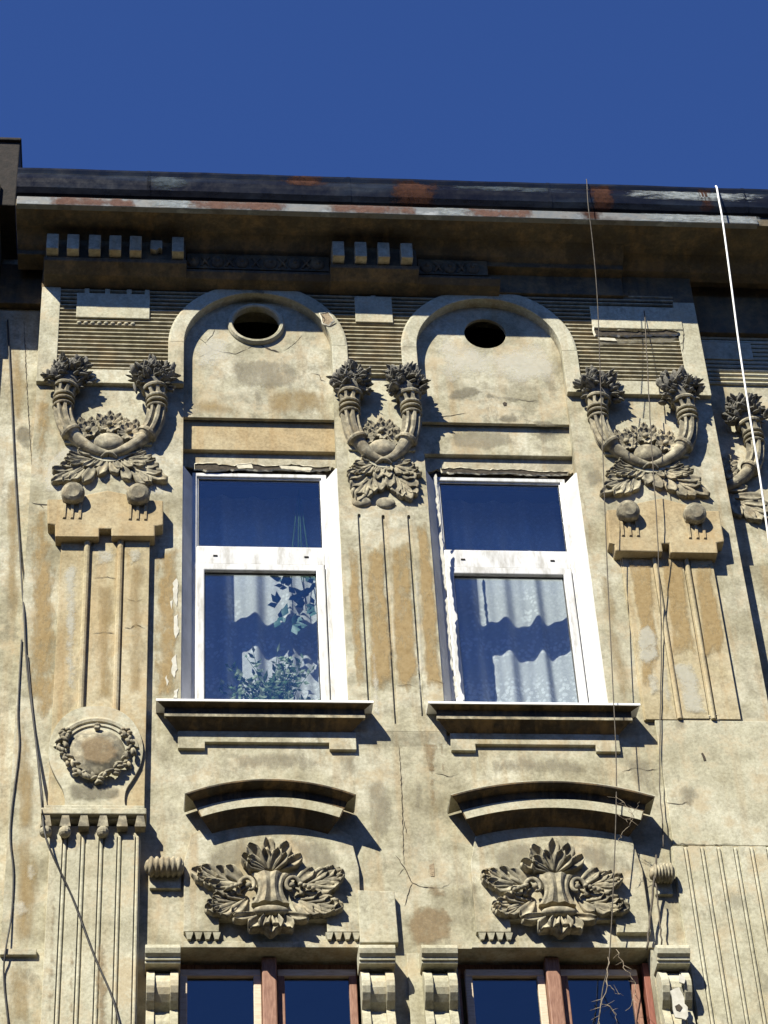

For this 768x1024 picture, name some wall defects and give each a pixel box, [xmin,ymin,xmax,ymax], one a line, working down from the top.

corrosion [288,176,319,186]
corrosion [332,181,433,214]
corrosion [582,185,614,219]
peeling [170,578,179,638]
peeling [165,655,179,698]
crack [396,745,449,904]
leakage [410,907,450,944]